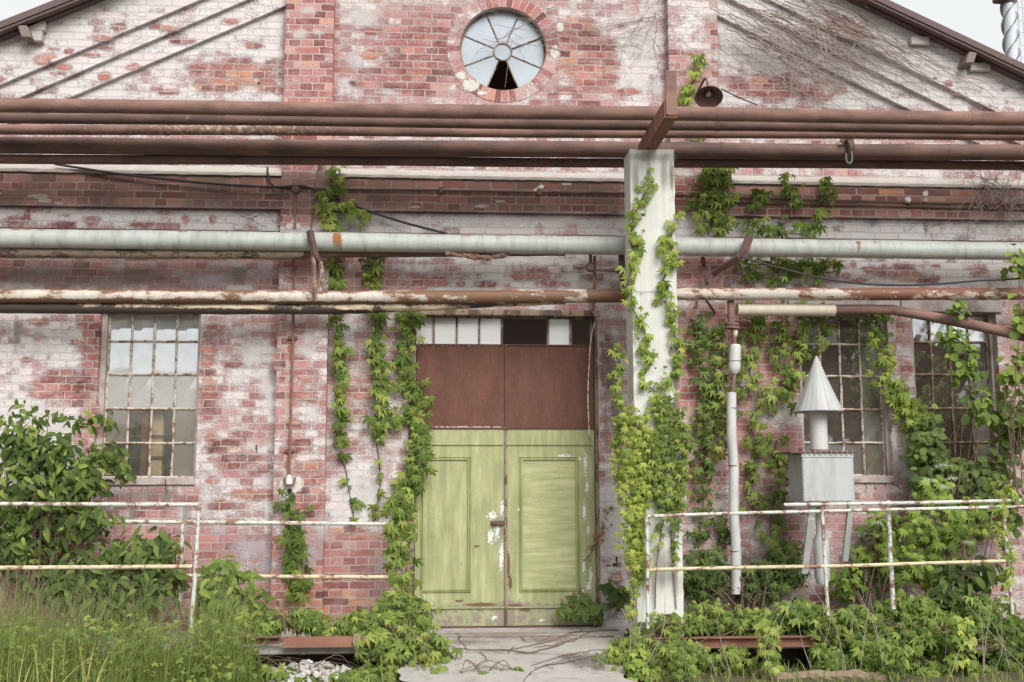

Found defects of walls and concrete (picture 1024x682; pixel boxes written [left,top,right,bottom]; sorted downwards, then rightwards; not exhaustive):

peeling [34,23,127,75]
peeling [149,23,194,45]
peeling [188,42,283,95]
peeling [199,325,326,519]
peeling [557,452,590,534]
peeling [486,500,504,572]
peeling [582,554,593,592]